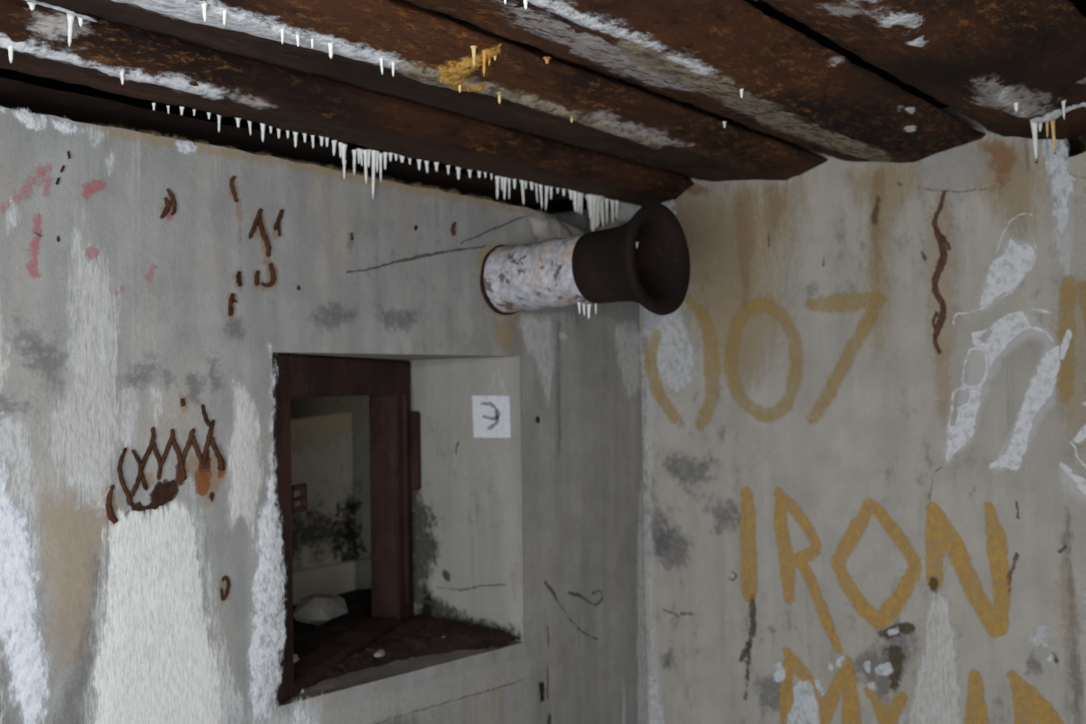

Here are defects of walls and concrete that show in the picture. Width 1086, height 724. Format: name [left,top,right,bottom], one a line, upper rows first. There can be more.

efflorescence [0,107,104,147]
efflorescence [0,0,223,132]
efflorescence [175,141,197,154]
water stain [112,0,690,149]
water stain [235,118,638,231]
efflorescence [870,0,928,47]
efflorescence [975,79,1086,276]
water stain [0,411,50,724]
water stain [43,205,366,724]
mould [412,490,519,635]
water stain [615,308,696,724]
water stain [539,666,549,702]